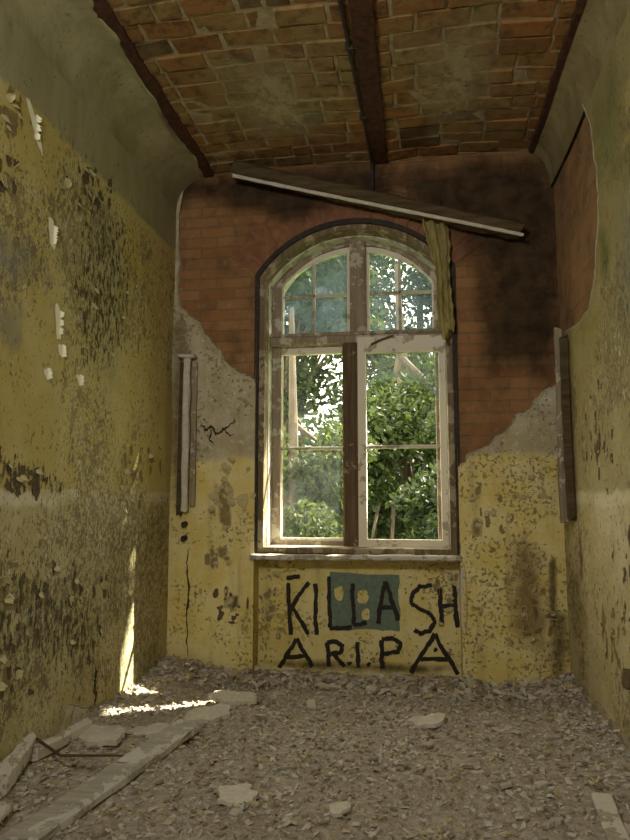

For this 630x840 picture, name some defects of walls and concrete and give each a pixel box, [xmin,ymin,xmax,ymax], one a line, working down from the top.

peeling [0,85,23,138]
spalling [272,103,599,333]
water stain [64,198,139,385]
spalling [175,172,426,381]
spalling [448,226,556,468]
peeling [6,463,44,501]
water stain [0,446,64,496]
crack [201,420,235,444]
peeling [585,411,613,480]
water stain [0,564,93,675]
peeling [600,598,630,671]